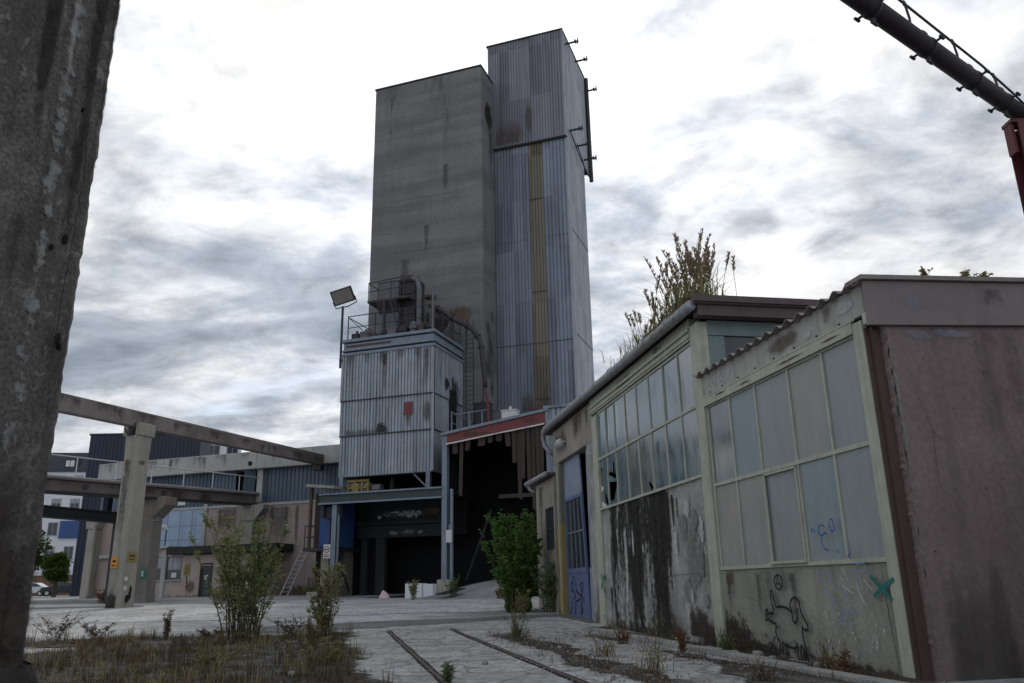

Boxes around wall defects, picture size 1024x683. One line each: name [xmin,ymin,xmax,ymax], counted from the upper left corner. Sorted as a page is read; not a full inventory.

damp [38,0,120,234]
damp [16,229,48,358]
peeling [673,499,709,609]
damp [609,490,840,662]